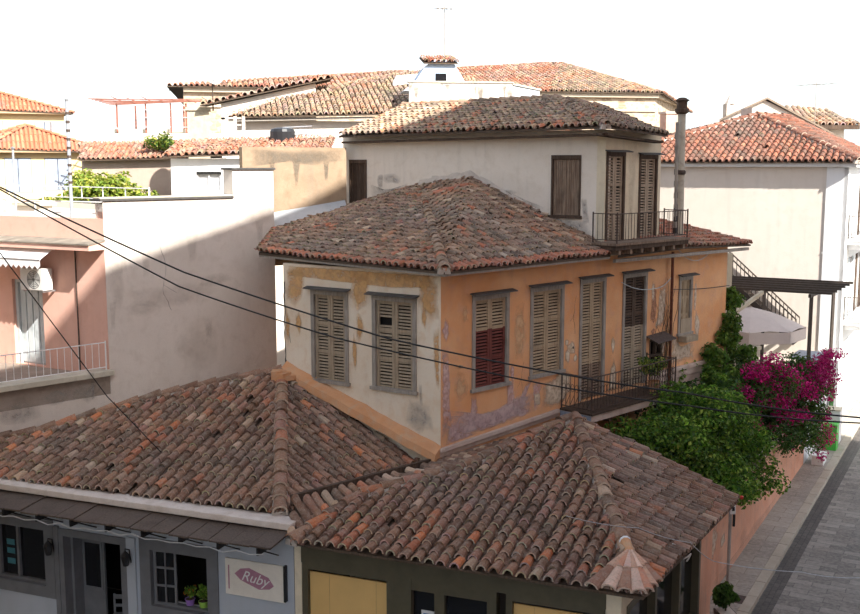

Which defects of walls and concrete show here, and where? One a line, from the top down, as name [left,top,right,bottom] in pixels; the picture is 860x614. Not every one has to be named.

leakage [268,153,328,176]
peeling [434,322,569,441]